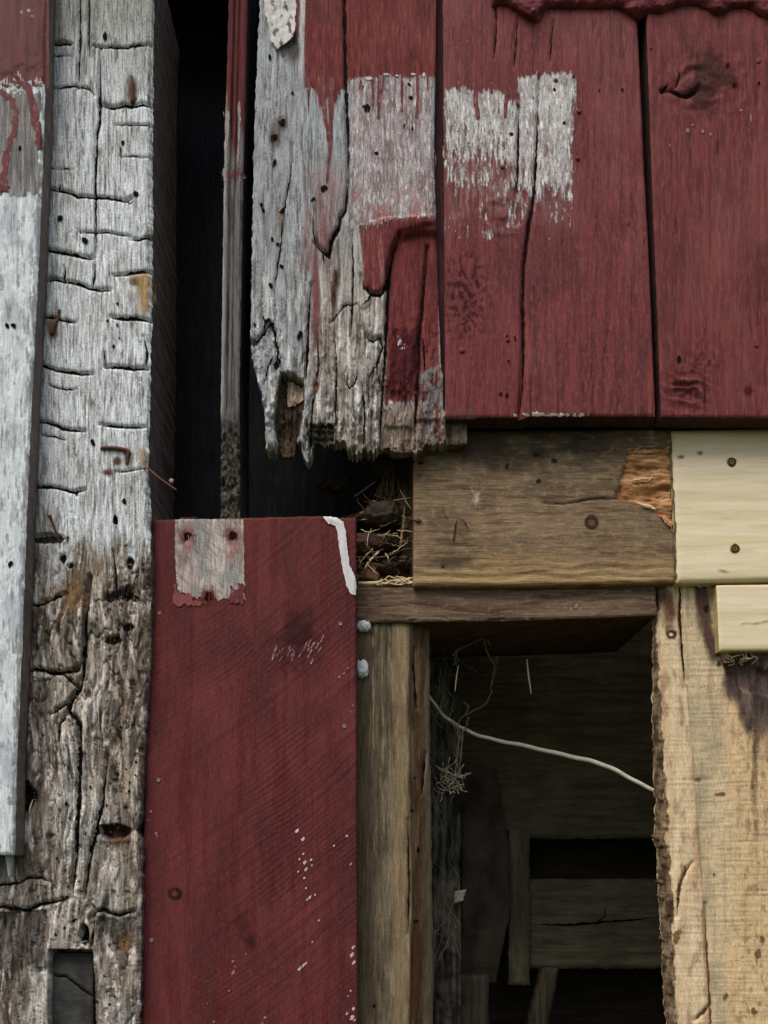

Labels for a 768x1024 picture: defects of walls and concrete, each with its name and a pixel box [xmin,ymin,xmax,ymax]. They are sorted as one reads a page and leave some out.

peeling [264,0,300,48]
peeling [0,70,43,199]
crack [48,0,152,292]
peeling [347,71,577,240]
crack [43,316,148,391]
corrosion [130,273,150,315]
crack [305,0,398,450]
peeling [384,328,446,449]
crack [516,94,539,417]
corrosion [103,449,146,475]
peeling [173,519,245,607]
crack [0,551,133,947]